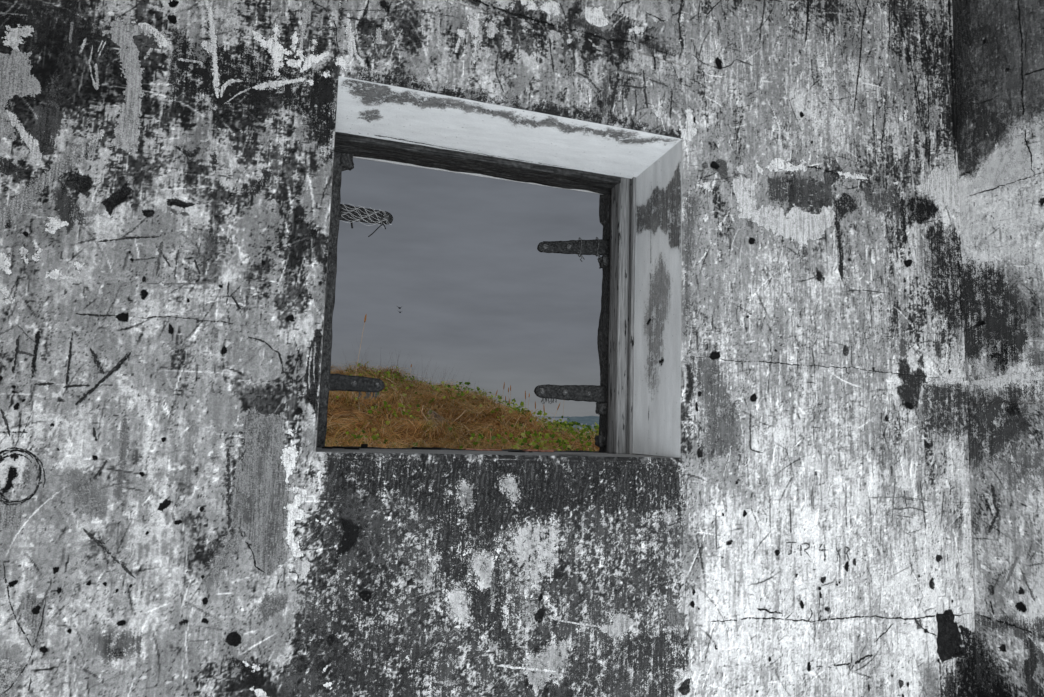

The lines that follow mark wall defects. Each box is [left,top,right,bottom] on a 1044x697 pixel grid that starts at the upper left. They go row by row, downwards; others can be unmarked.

leakage [952,0,1030,177]
leakage [681,188,703,334]
leakage [767,172,845,280]
peeling [0,497,24,532]
leakage [278,349,744,697]
leakage [224,654,263,697]
crack [710,601,1044,675]
spalling [914,600,976,697]